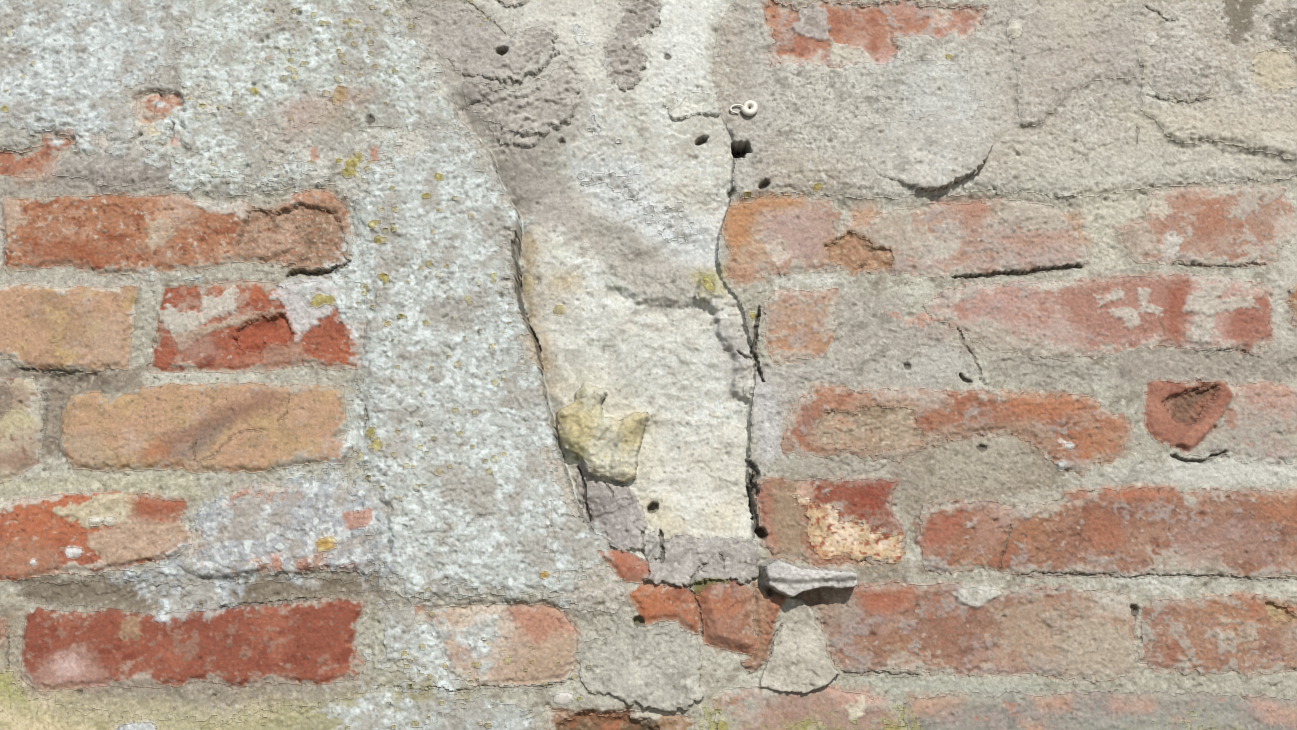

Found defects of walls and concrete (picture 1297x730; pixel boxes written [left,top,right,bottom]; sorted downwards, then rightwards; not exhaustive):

spalling [238,204,350,270]
spalling [824,232,894,275]
crack [512,233,544,369]
spalling [236,315,292,354]
crack [739,309,765,382]
spalling [817,405,941,455]
spalling [1164,386,1221,426]
crack [746,461,761,531]
spalling [0,671,298,730]
peeling [558,615,704,730]
peeling [761,597,840,693]
spalling [1264,602,1294,623]